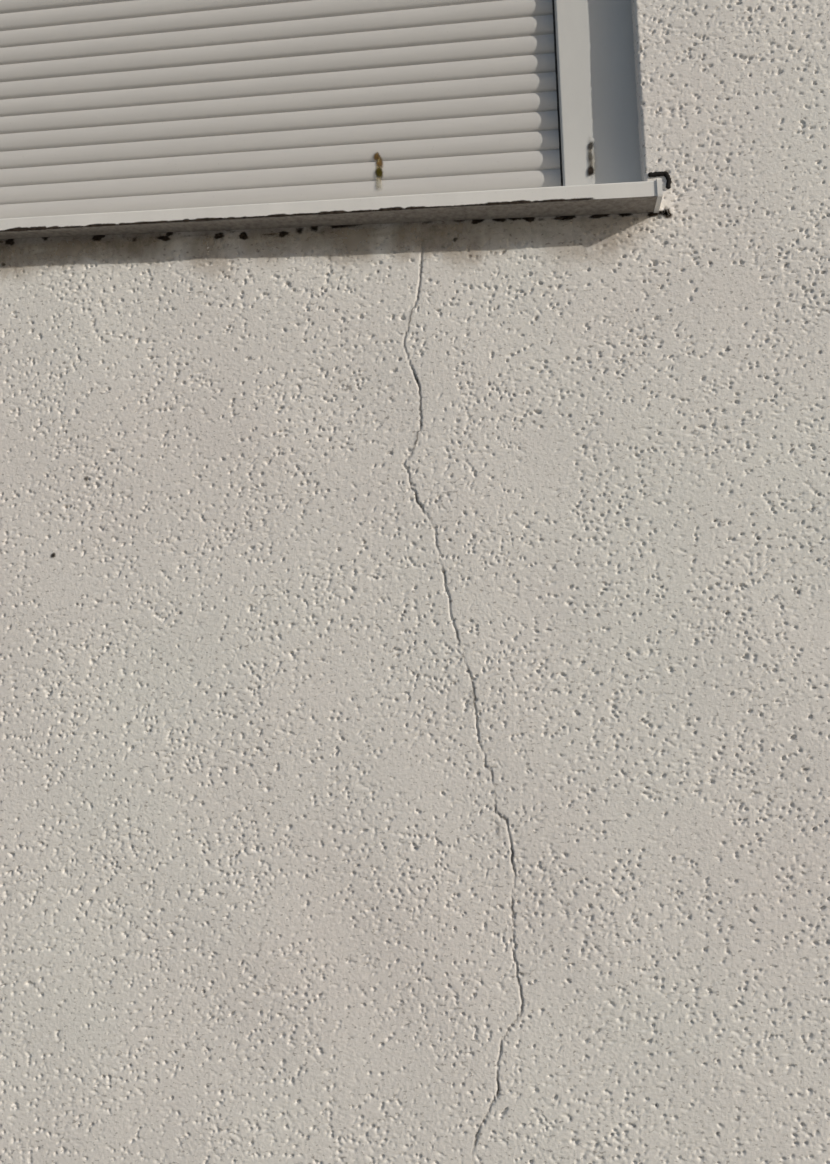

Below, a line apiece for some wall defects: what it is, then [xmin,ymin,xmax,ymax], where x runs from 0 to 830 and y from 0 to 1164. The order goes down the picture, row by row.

leakage [0,198,593,261]
leakage [648,208,672,218]
crack [411,367,422,450]